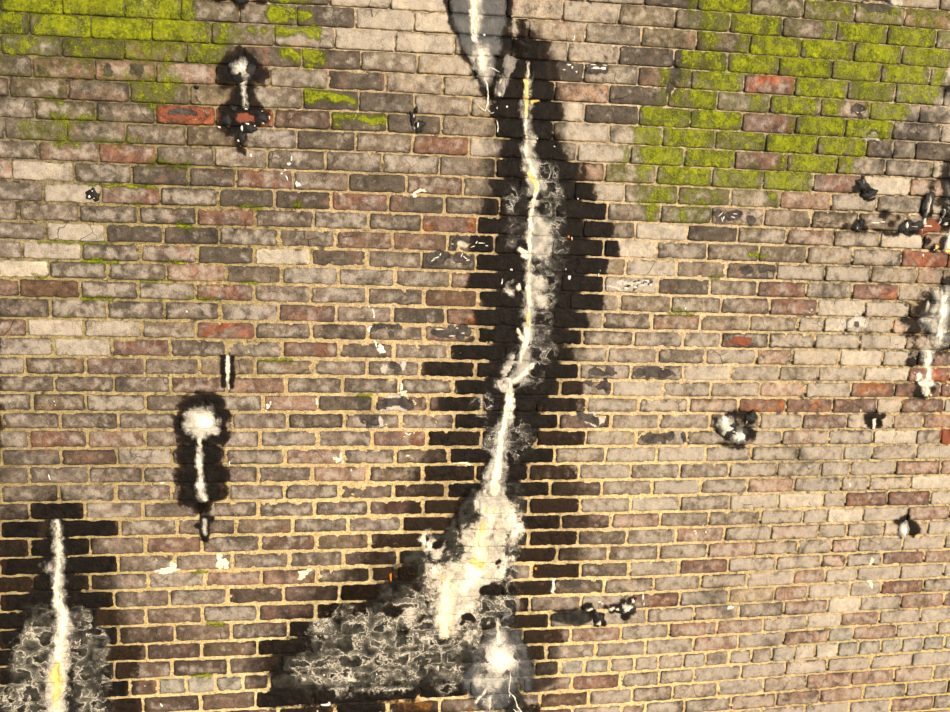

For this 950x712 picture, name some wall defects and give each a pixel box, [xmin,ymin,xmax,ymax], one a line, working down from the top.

leakage [883,112,947,162]
leakage [253,0,620,712]
leakage [916,351,933,396]
leakage [194,516,215,543]
leakage [0,493,146,712]